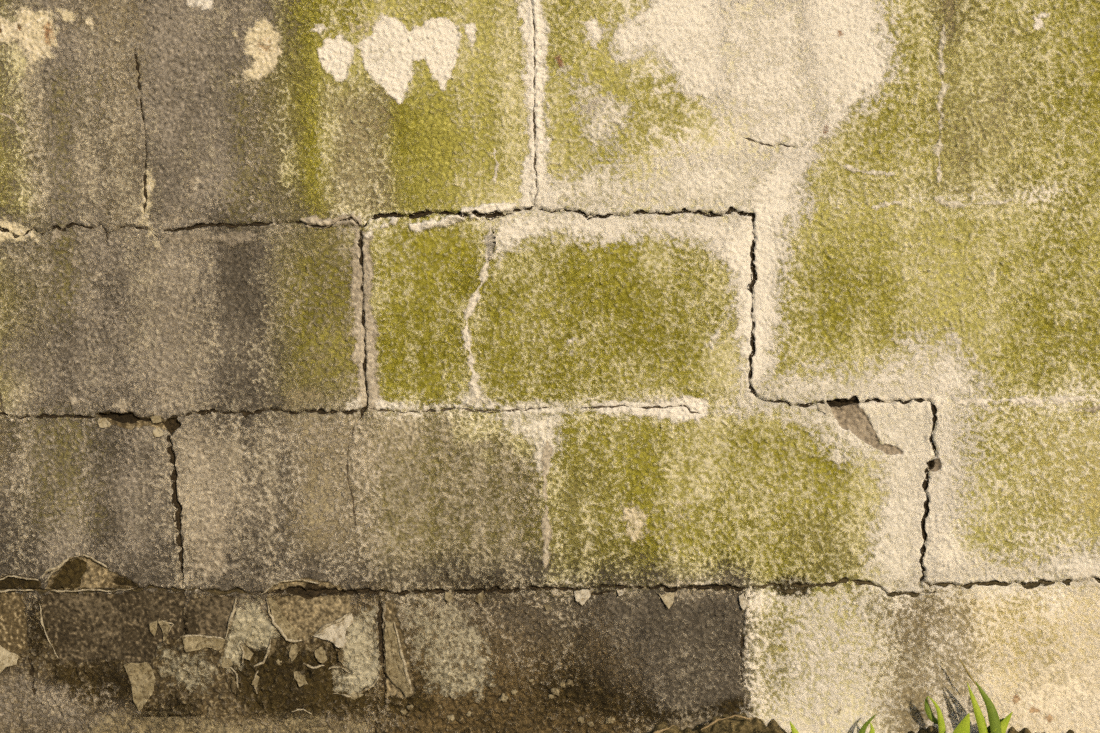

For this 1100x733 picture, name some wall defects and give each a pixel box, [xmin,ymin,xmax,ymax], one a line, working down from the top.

crack [134,53,147,213]
peeling [184,174,202,192]
crack [529,0,537,139]
water stain [625,76,687,139]
crack [0,148,1100,699]
spalling [817,396,903,455]
peeling [0,398,254,711]
peeling [24,685,118,720]
peeling [262,577,373,700]
peeling [384,600,416,716]